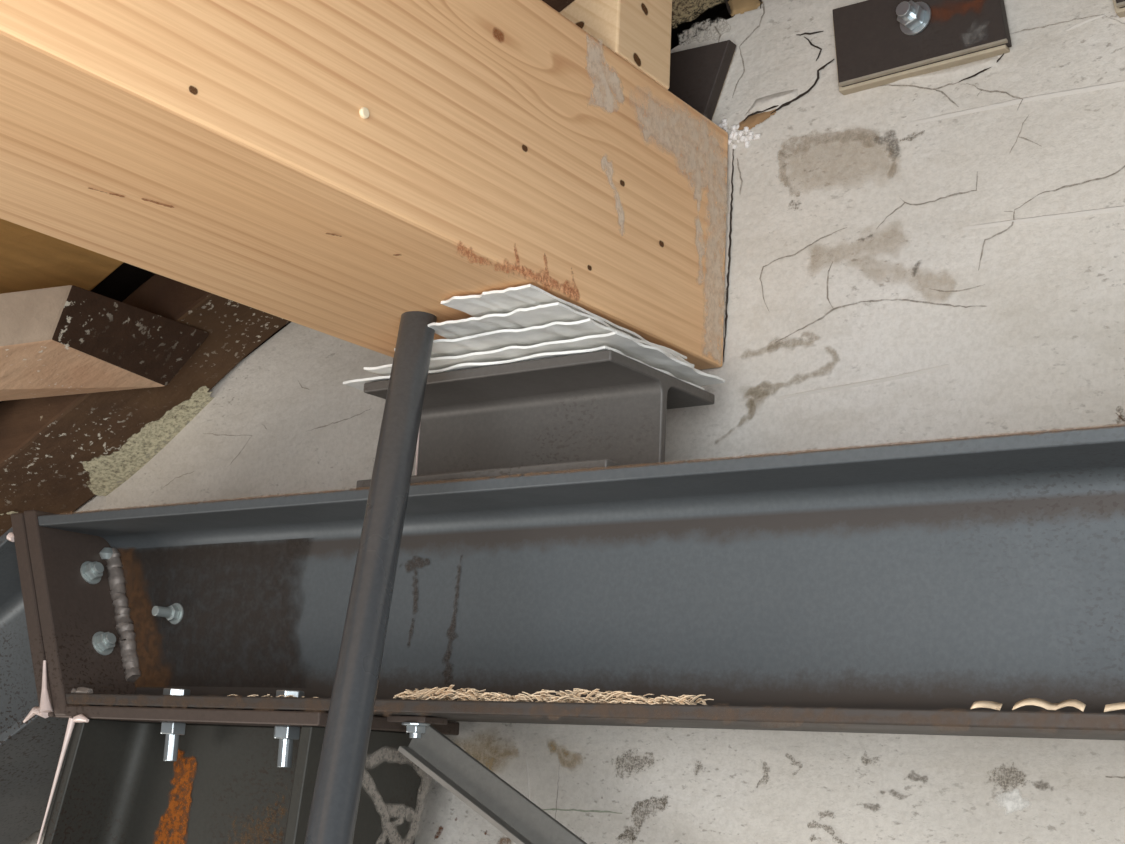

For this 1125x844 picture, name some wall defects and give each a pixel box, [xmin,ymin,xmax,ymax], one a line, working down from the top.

crack [770,31,834,114]
crack [885,54,1023,103]
crack [723,153,742,362]
corrosion [119,550,168,689]
corrosion [155,750,197,844]